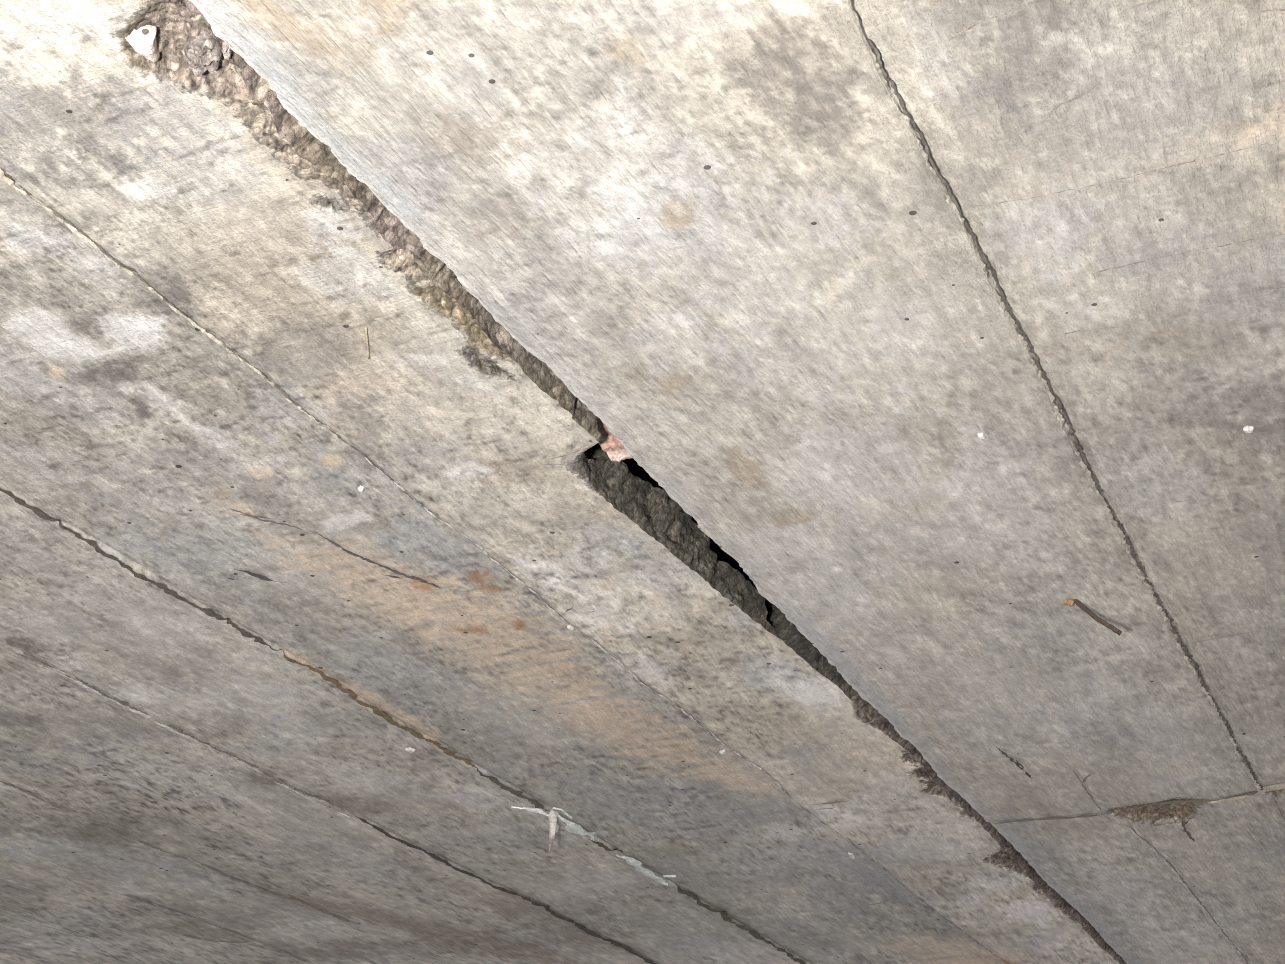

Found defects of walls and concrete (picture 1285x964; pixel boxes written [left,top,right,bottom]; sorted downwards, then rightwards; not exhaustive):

crack [1247,5,1285,13]
crack [1,169,187,317]
crack [0,488,548,811]
crack [0,641,655,964]
crack [217,339,1008,964]
crack [866,39,1285,964]